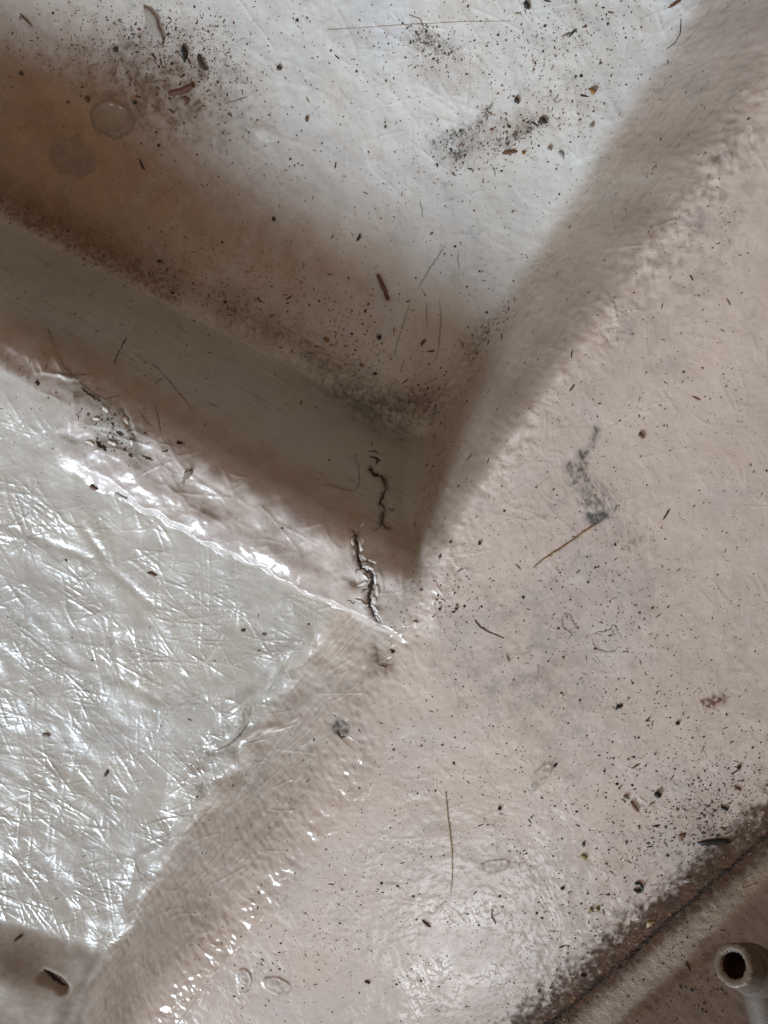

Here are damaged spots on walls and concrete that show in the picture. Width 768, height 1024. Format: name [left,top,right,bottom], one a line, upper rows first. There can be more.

crack [315,442,395,632]